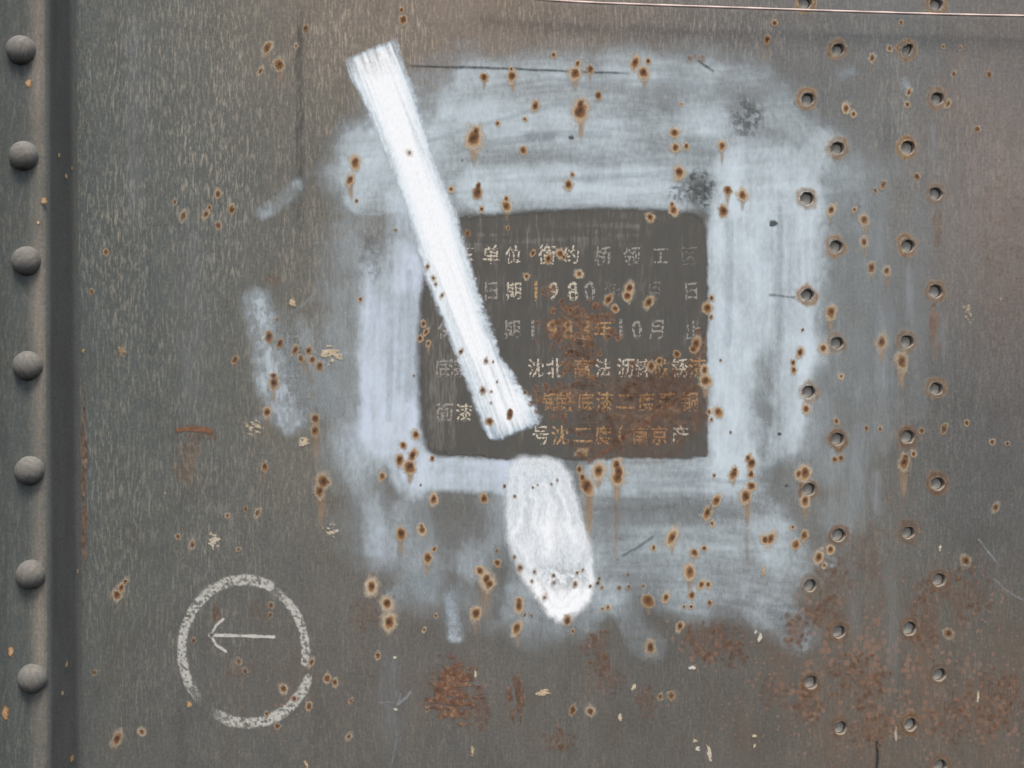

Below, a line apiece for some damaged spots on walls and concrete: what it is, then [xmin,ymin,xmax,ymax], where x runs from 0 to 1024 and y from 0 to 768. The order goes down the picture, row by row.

rust [507,67,518,90]
rust [569,60,602,137]
rust [630,54,651,86]
rust [462,125,484,161]
rust [702,294,714,320]
rust [797,284,837,327]
rust [524,281,634,422]
rust [619,328,724,422]
rust [790,347,805,375]
rust [565,426,625,531]
rust [365,577,397,633]
rust [426,656,482,726]